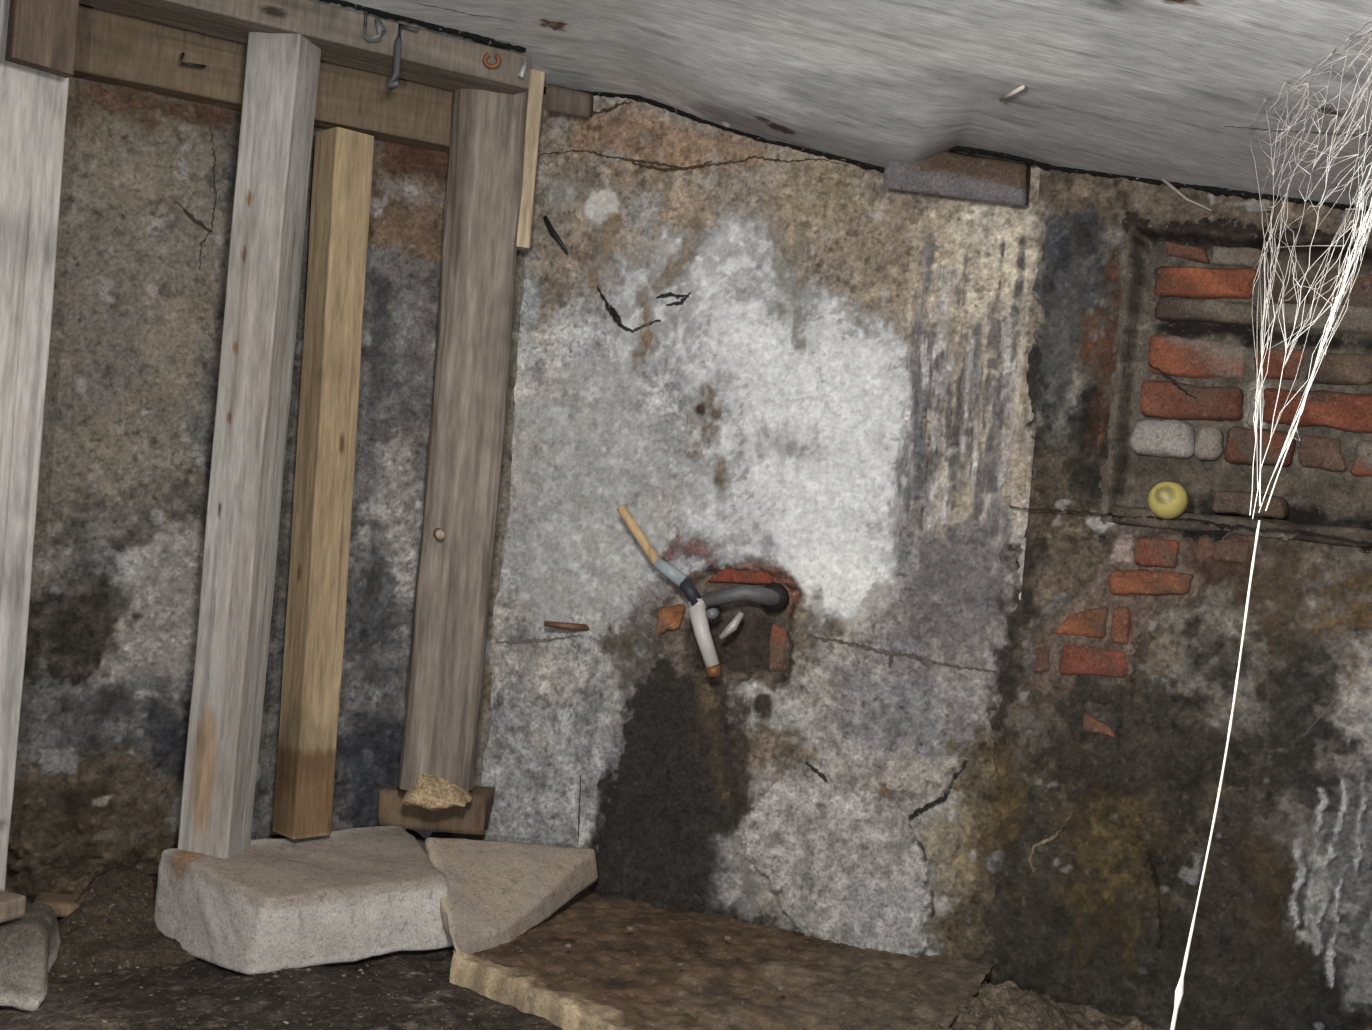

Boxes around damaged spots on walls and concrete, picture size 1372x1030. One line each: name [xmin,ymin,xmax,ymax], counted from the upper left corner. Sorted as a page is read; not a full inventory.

crack [320,0,526,52]
peeling [548,184,620,225]
crack [540,90,885,173]
crack [596,286,691,333]
peeling [507,215,929,717]
damp [893,203,1122,753]
flaking render [1020,515,1257,742]
damp [591,652,757,914]
crack [805,762,829,784]
crack [908,756,969,918]
damp [991,616,1366,1030]